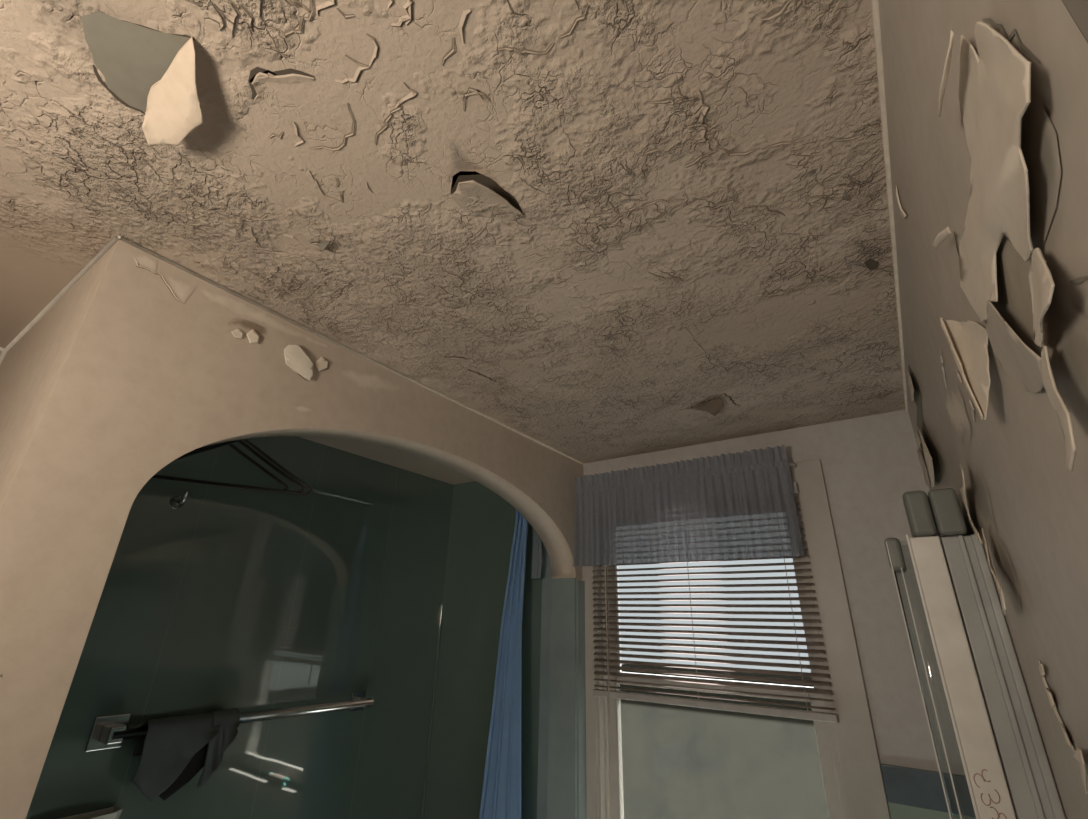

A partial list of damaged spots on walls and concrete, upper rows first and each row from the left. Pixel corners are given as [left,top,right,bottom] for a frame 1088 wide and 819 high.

peeling [82,11,203,146]
crack [212,0,418,203]
crack [442,9,472,66]
crack [462,87,492,112]
peeling [445,136,525,220]
crack [497,4,590,55]
crack [649,90,869,168]
crack [712,184,850,216]
peeling [932,18,1088,471]
peeling [907,364,942,487]
peeling [959,463,1021,615]
spalling [1038,660,1087,795]